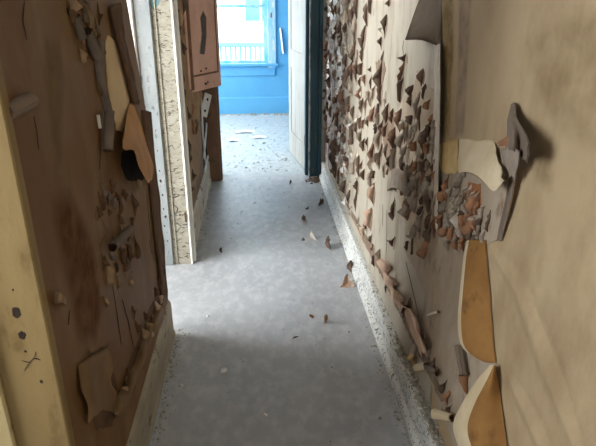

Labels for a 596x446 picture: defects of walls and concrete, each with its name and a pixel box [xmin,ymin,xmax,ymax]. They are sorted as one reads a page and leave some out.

peeling [68,0,103,39]
spalling [183,75,209,191]
spalling [121,150,144,182]
peeling [96,189,140,226]
peeling [322,0,509,446]
peeling [101,235,141,284]